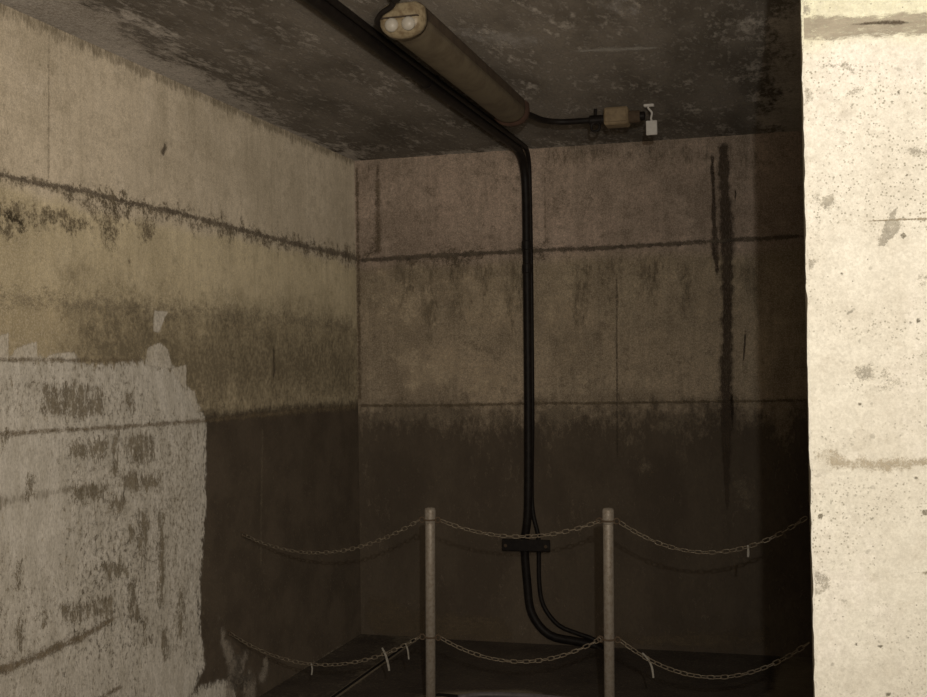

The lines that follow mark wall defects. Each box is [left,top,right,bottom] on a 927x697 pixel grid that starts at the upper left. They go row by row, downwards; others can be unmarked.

damp [80,0,510,160]
damp [338,0,795,149]
damp [804,12,927,40]
peeling [153,311,167,332]
damp [0,145,812,697]
peeling [0,333,236,697]